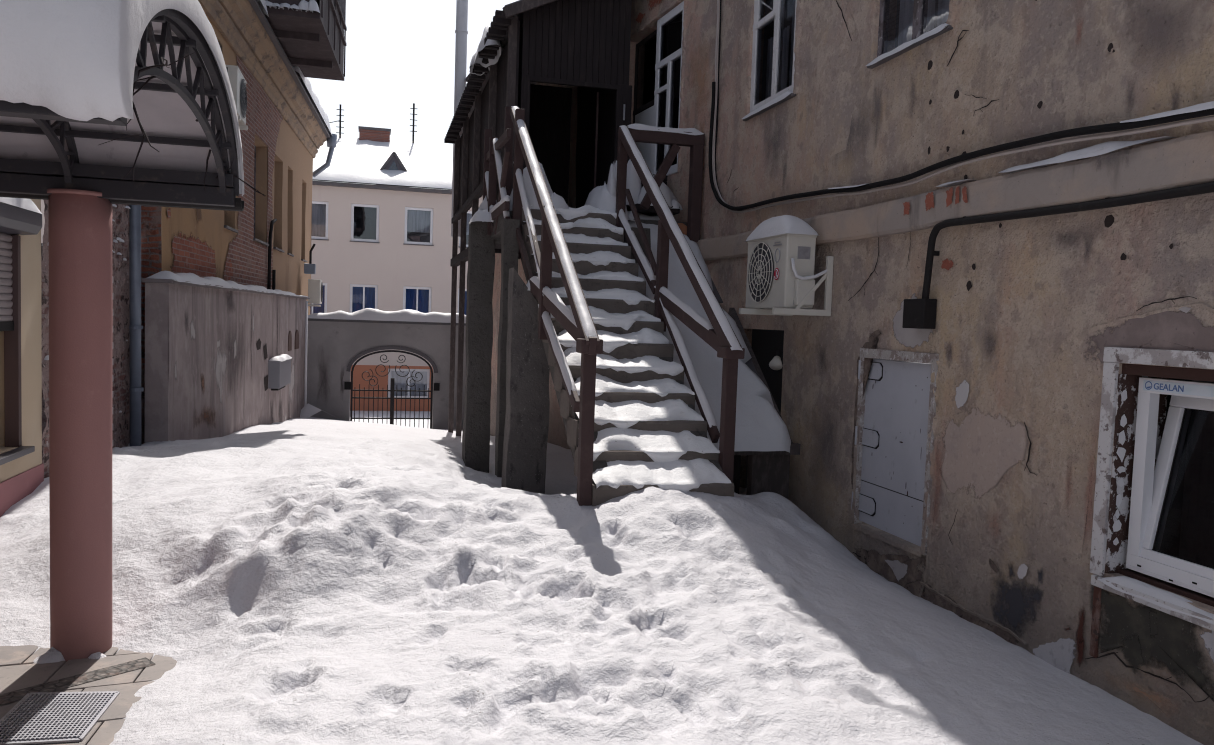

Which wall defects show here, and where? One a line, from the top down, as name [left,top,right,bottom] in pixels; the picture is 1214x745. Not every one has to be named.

flaking render [170,55,283,289]
flaking render [1077,303,1214,363]
peeling [1113,389,1127,545]
leakage [993,563,1042,634]